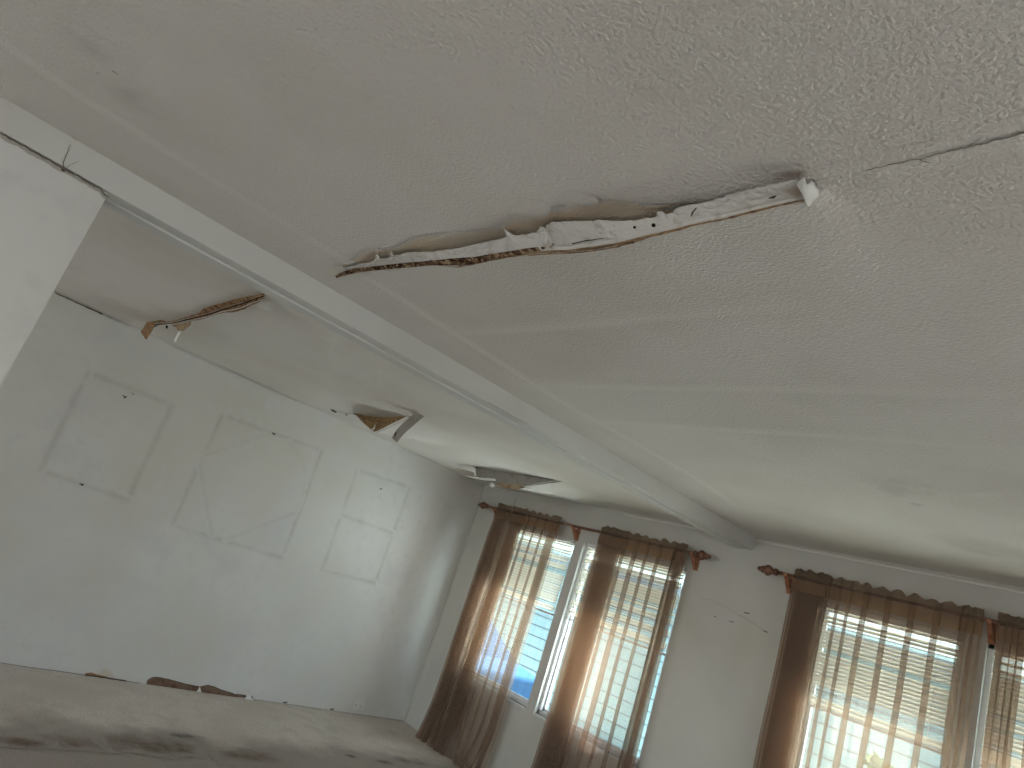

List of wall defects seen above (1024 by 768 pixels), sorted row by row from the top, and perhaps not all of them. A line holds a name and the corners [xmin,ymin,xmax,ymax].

crack [0,133,109,199]
peeling [457,465,496,481]
spalling [85,666,126,682]